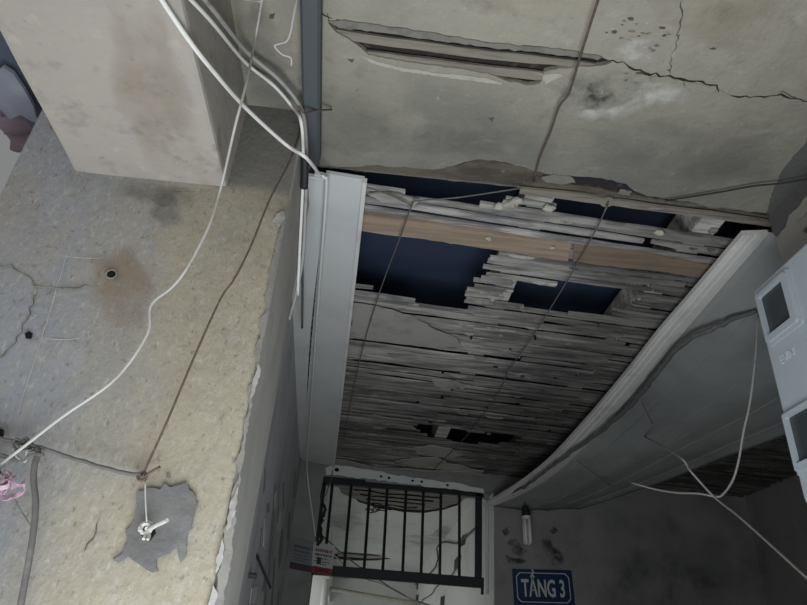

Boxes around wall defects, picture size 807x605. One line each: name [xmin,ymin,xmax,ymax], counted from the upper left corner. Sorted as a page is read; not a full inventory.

spalling [328,19,607,85]
spalling [605,17,680,52]
crack [602,1,807,102]
water stain [549,78,685,119]
crack [0,264,95,358]